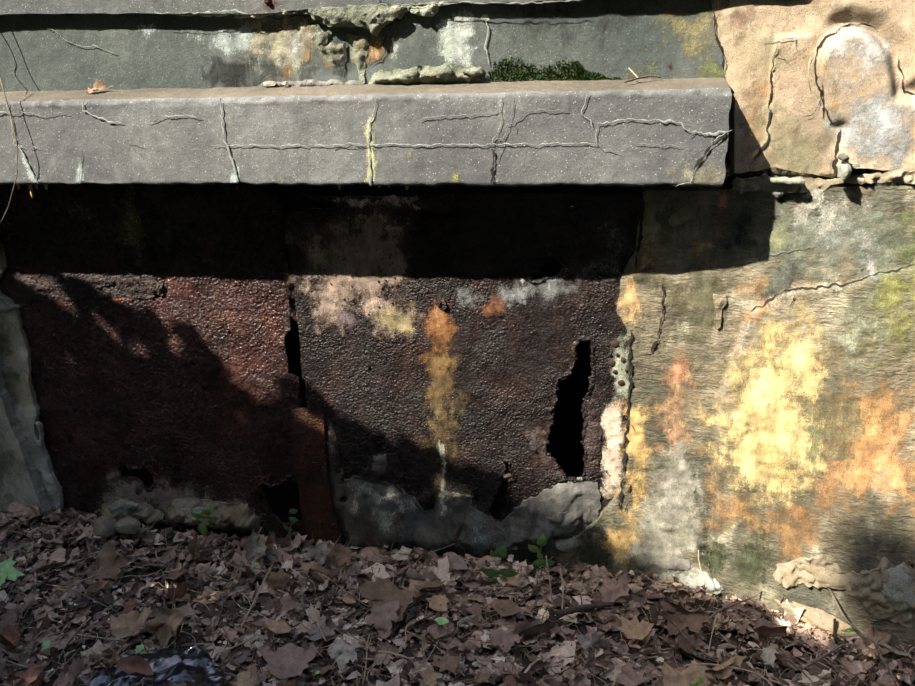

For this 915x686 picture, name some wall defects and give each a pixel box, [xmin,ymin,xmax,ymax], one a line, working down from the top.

crack [154,90,732,186]
crack [753,23,914,175]
corrosion [339,312,355,328]
corrosion [420,301,464,490]
corrosion [483,294,506,315]
corrosion [608,340,628,385]
corrosion [618,243,657,321]
corrosion [698,278,915,560]